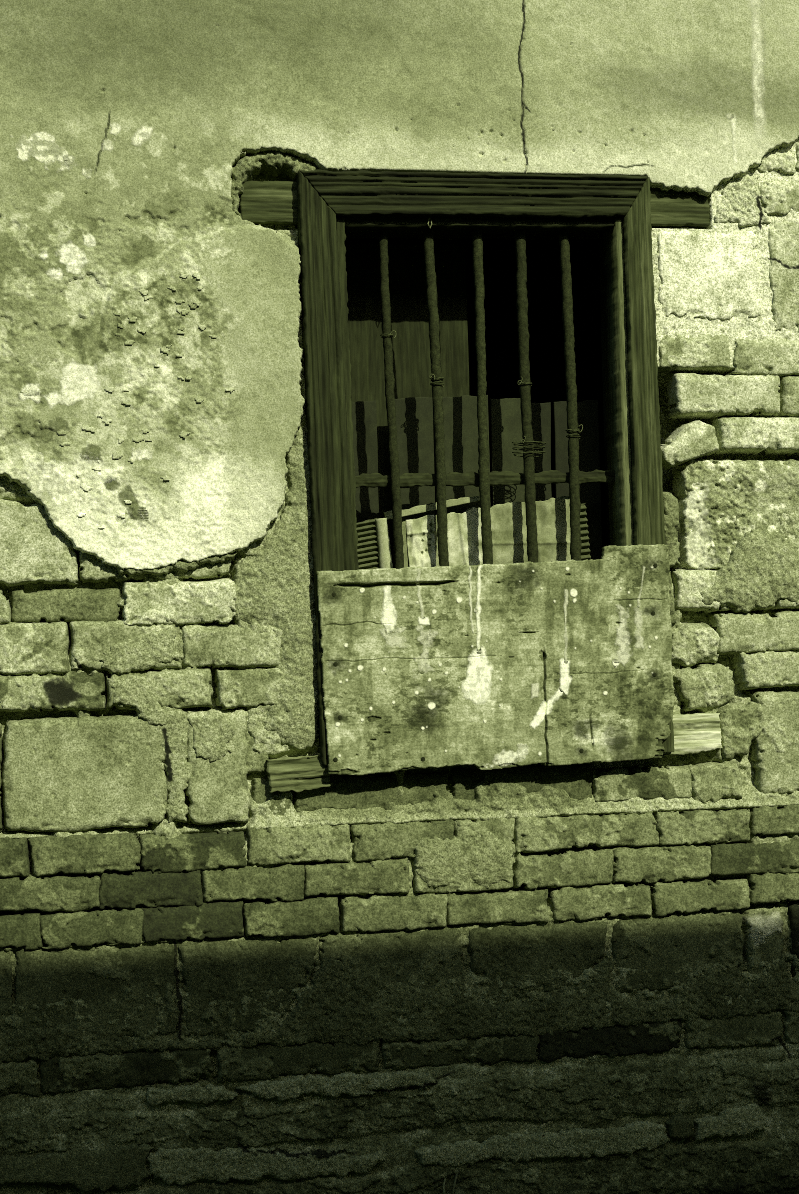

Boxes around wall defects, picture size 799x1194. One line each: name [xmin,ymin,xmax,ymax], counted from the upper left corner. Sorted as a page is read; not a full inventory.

crack [518,0,530,173]
spalling [231,151,317,219]
peeling [155,273,203,367]
spalling [660,420,719,470]
spalling [671,622,763,804]